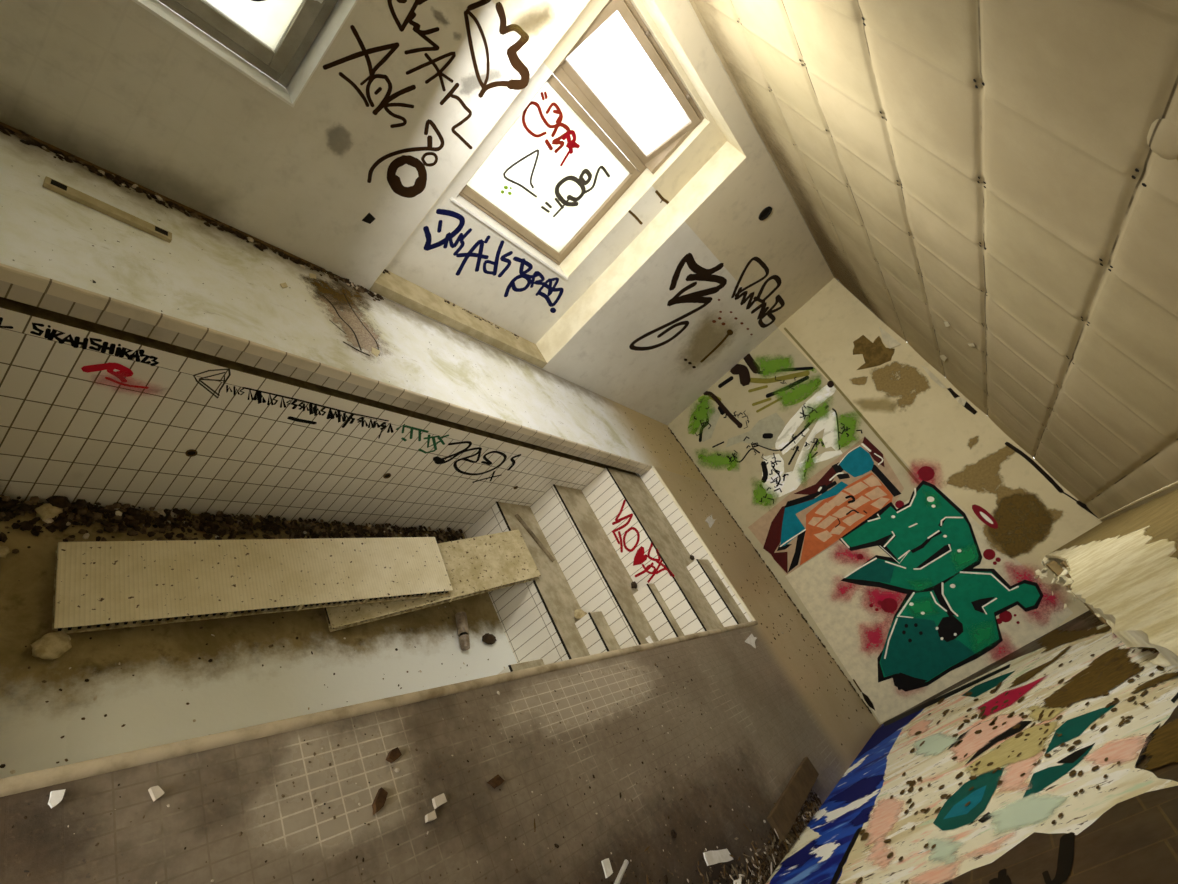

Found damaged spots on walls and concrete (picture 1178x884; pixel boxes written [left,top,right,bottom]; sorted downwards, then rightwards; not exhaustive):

peeling [851,327,977,415]